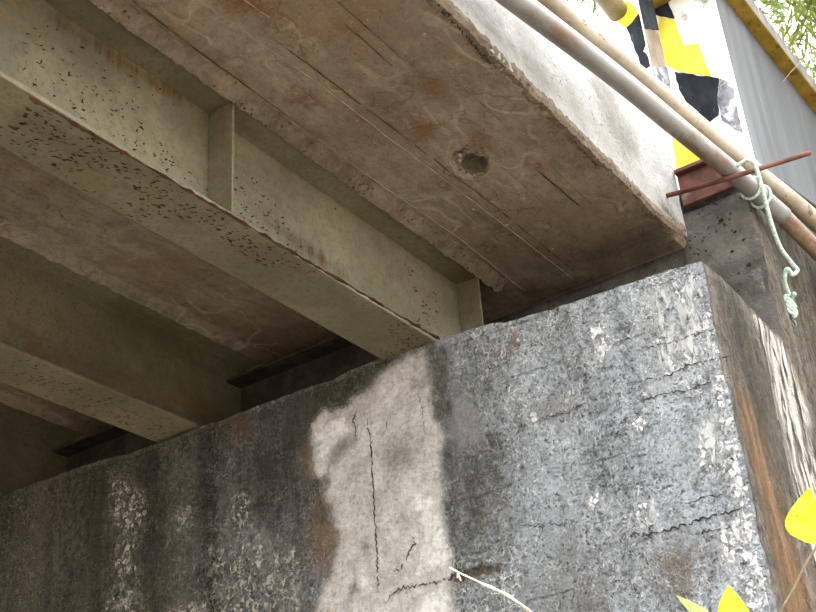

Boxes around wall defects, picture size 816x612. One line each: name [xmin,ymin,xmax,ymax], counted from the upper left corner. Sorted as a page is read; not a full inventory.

spalling [89,0,517,292]
crack [432,0,500,71]
spalling [425,0,686,237]
leakage [755,316,816,500]
crack [352,409,506,603]
crack [623,494,750,537]